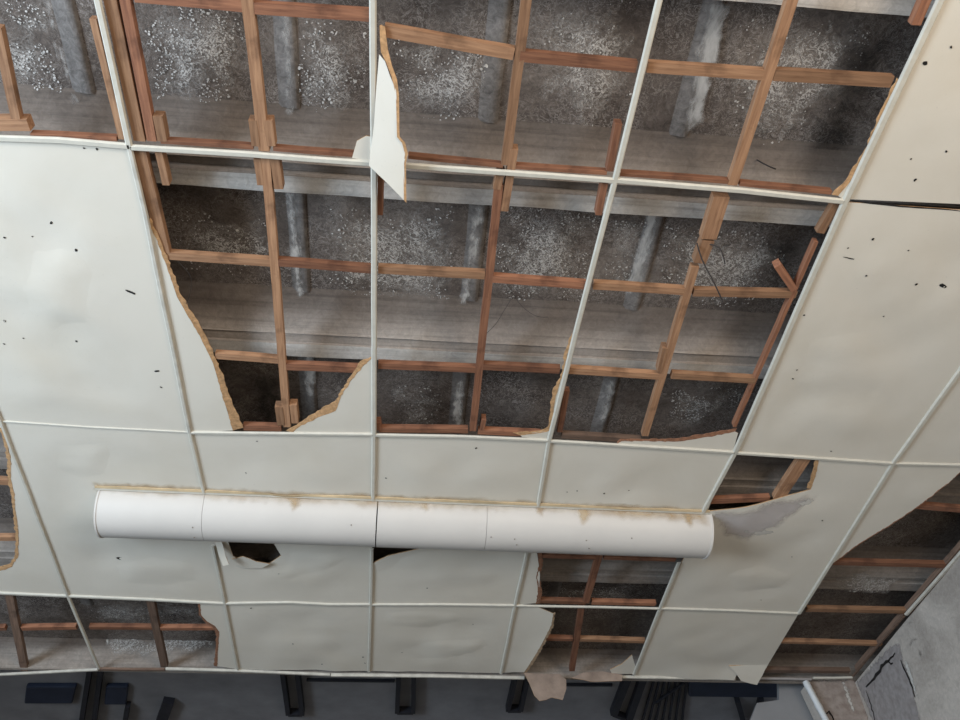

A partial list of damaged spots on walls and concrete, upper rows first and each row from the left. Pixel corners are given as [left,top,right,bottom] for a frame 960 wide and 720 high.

peeling [715,499,813,537]
crack [866,652,915,720]